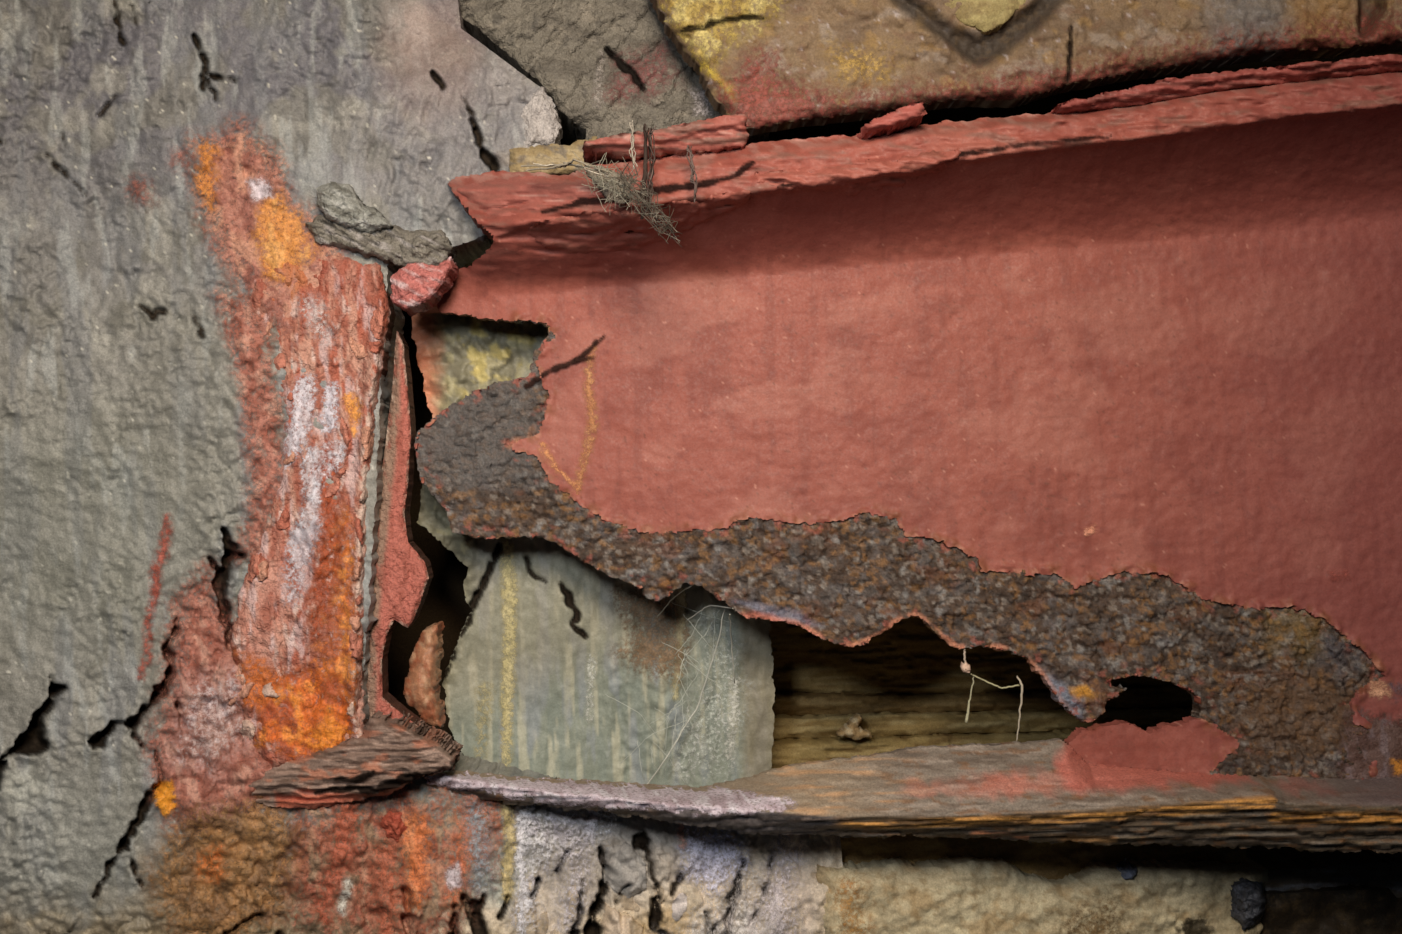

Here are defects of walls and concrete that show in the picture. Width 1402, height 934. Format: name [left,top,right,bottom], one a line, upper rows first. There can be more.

crack [88,619,182,899]
crack [208,527,245,647]
corrosion [172,117,345,564]
corrosion [137,445,518,934]
corrosion [344,392,360,437]
crack [449,846,684,934]
crack [704,854,774,933]
corrosion [414,320,1402,780]